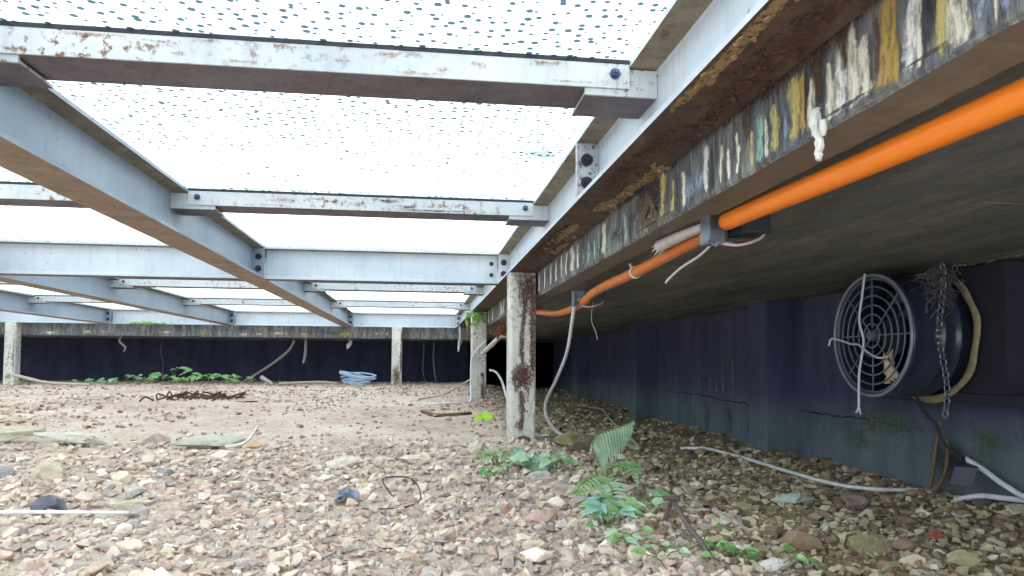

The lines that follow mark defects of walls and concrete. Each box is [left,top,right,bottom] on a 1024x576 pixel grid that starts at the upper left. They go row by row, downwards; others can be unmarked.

corrosion [592,160,670,214]
corrosion [512,222,585,441]
crack [798,409,893,425]